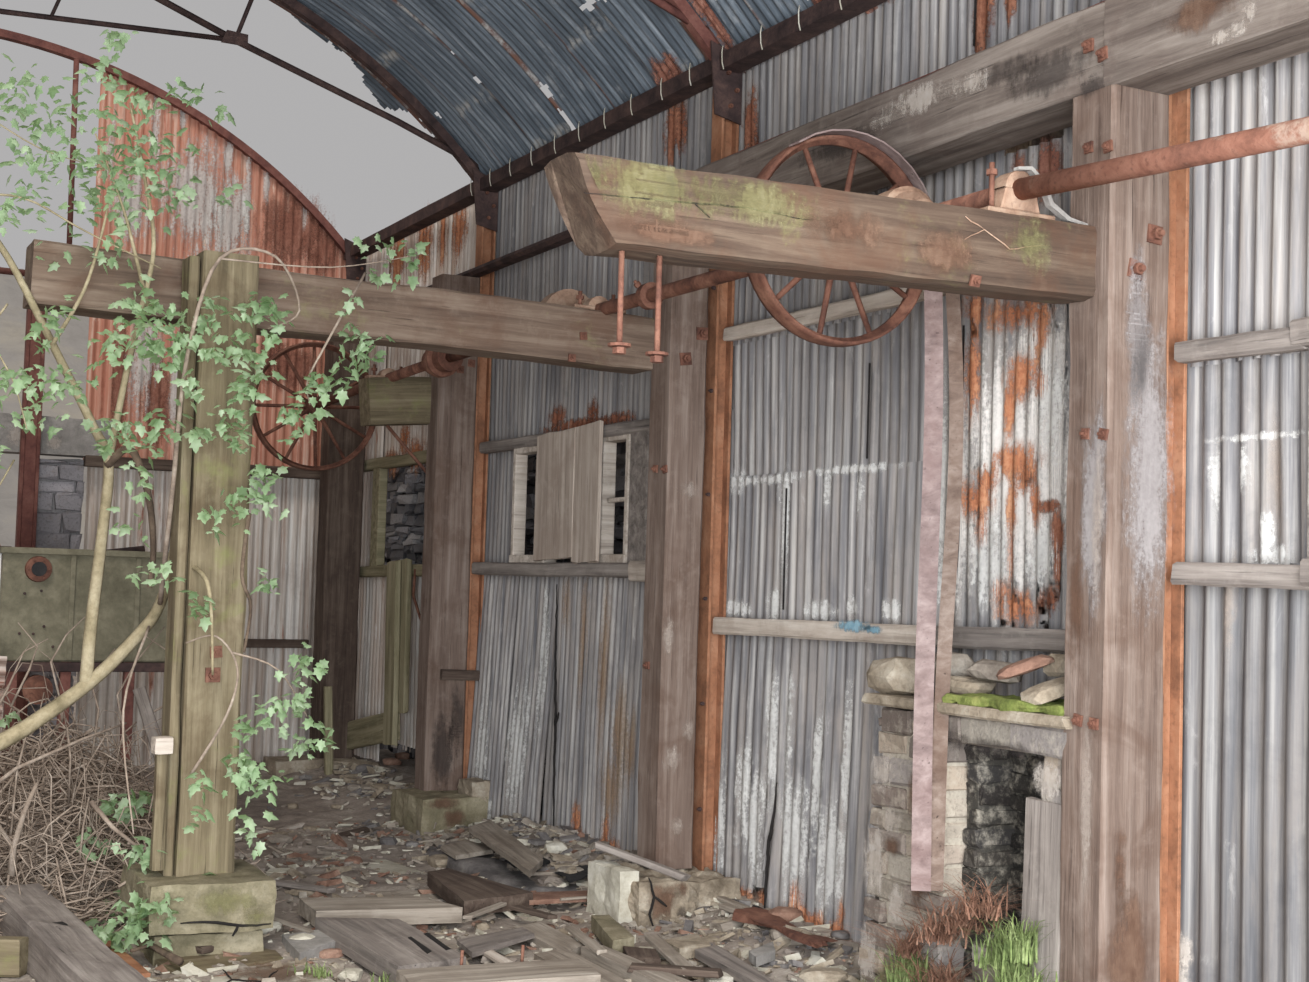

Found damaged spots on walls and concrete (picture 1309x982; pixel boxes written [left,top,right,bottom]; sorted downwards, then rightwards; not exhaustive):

rust [689,0,736,50]
rust [973,0,1017,53]
rust [651,53,683,85]
rust [662,101,688,166]
rust [744,71,759,149]
rust [1012,134,1063,174]
rust [264,189,341,275]
rust [543,398,636,433]
rust [961,296,1064,629]
leakage [730,463,888,567]